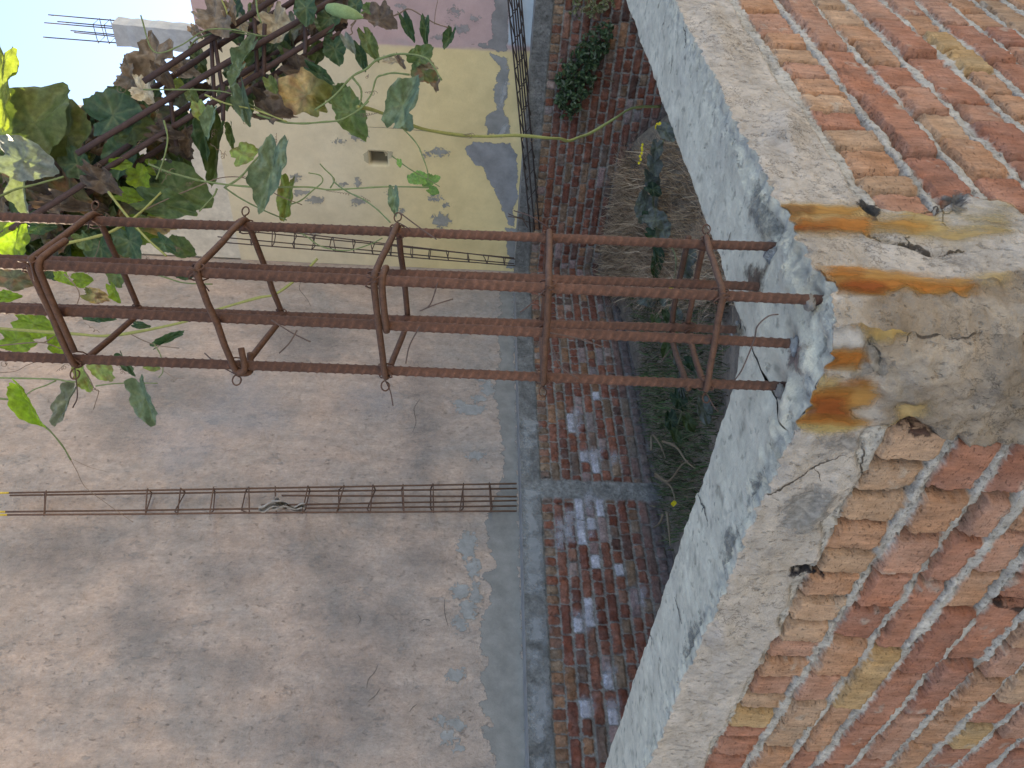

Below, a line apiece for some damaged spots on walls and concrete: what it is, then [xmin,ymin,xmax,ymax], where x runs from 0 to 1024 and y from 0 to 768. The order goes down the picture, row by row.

peeling [428,0,518,269]
peeling [423,147,450,159]
peeling [290,173,324,204]
peeling [339,177,365,206]
rust [781,204,1009,240]
rust [821,266,1005,297]
rust [796,346,879,433]
crack [764,408,865,496]
peeling [445,335,525,768]